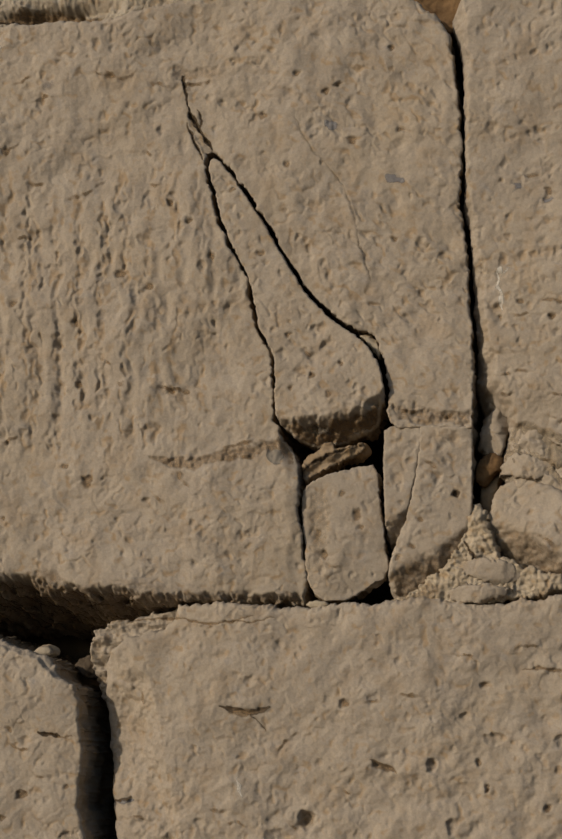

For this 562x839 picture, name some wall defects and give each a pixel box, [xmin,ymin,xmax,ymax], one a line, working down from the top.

crack [182,76,213,160]
spalling [476,408,562,513]